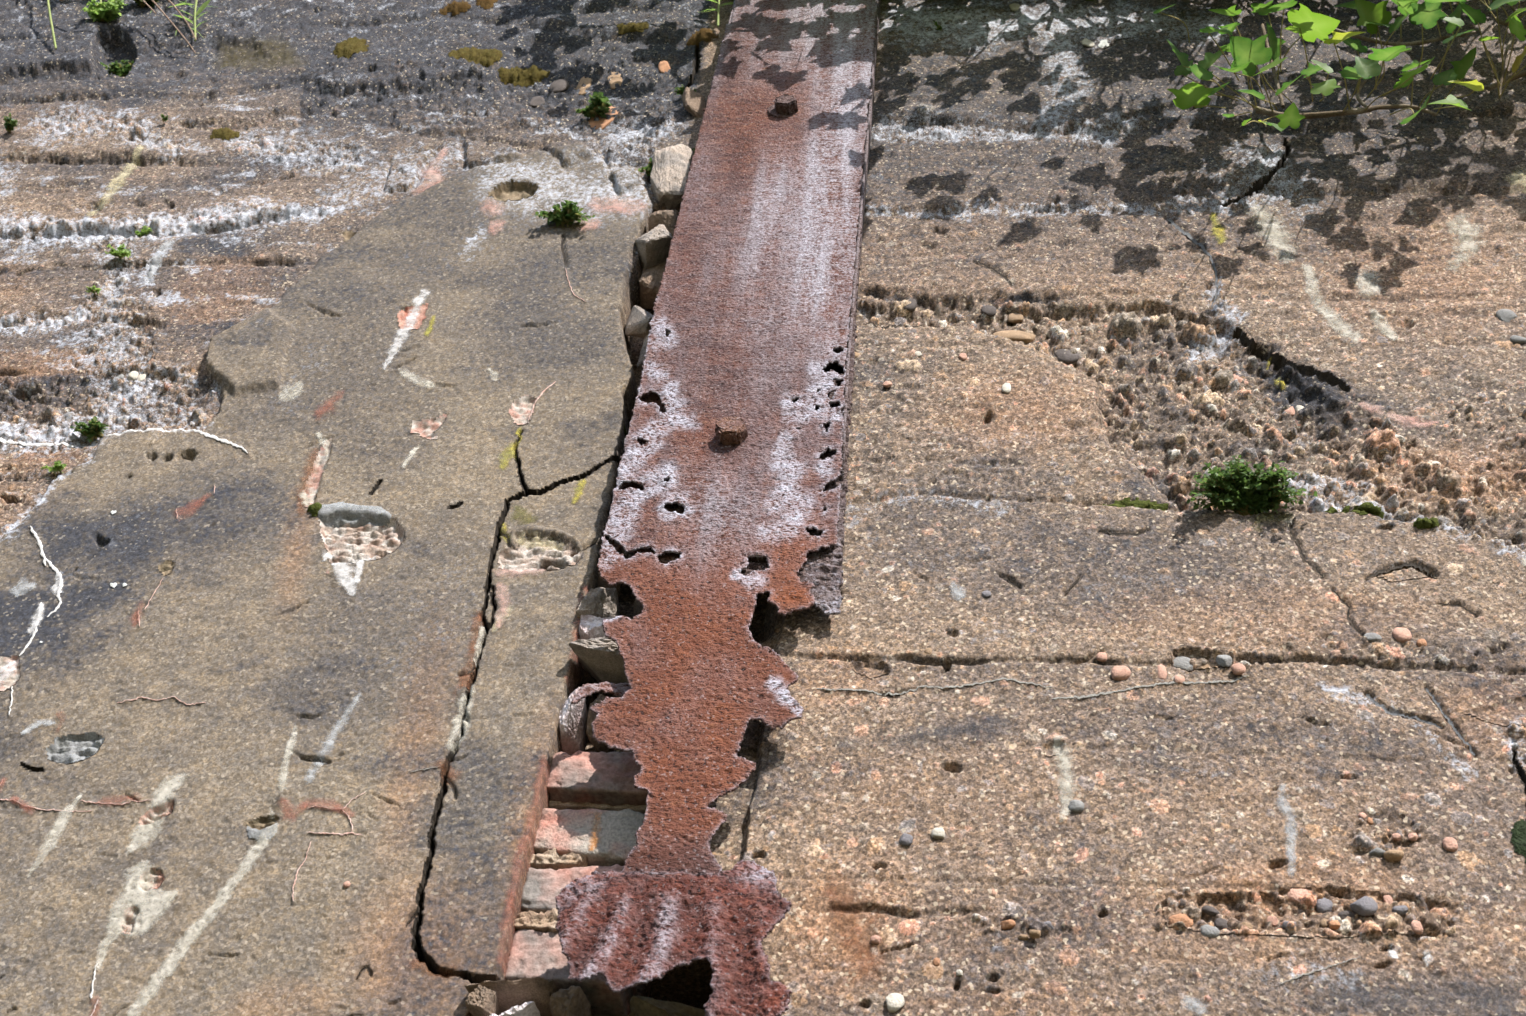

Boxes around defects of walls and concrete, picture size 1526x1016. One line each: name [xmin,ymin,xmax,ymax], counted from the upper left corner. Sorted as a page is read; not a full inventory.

crack [1220,137,1292,207]
crack [1167,219,1351,392]
crack [369,479,383,495]
crack [406,381,620,984]
rust [567,658,631,704]
crack [1511,748,1526,821]
spalling [465,977,592,1016]